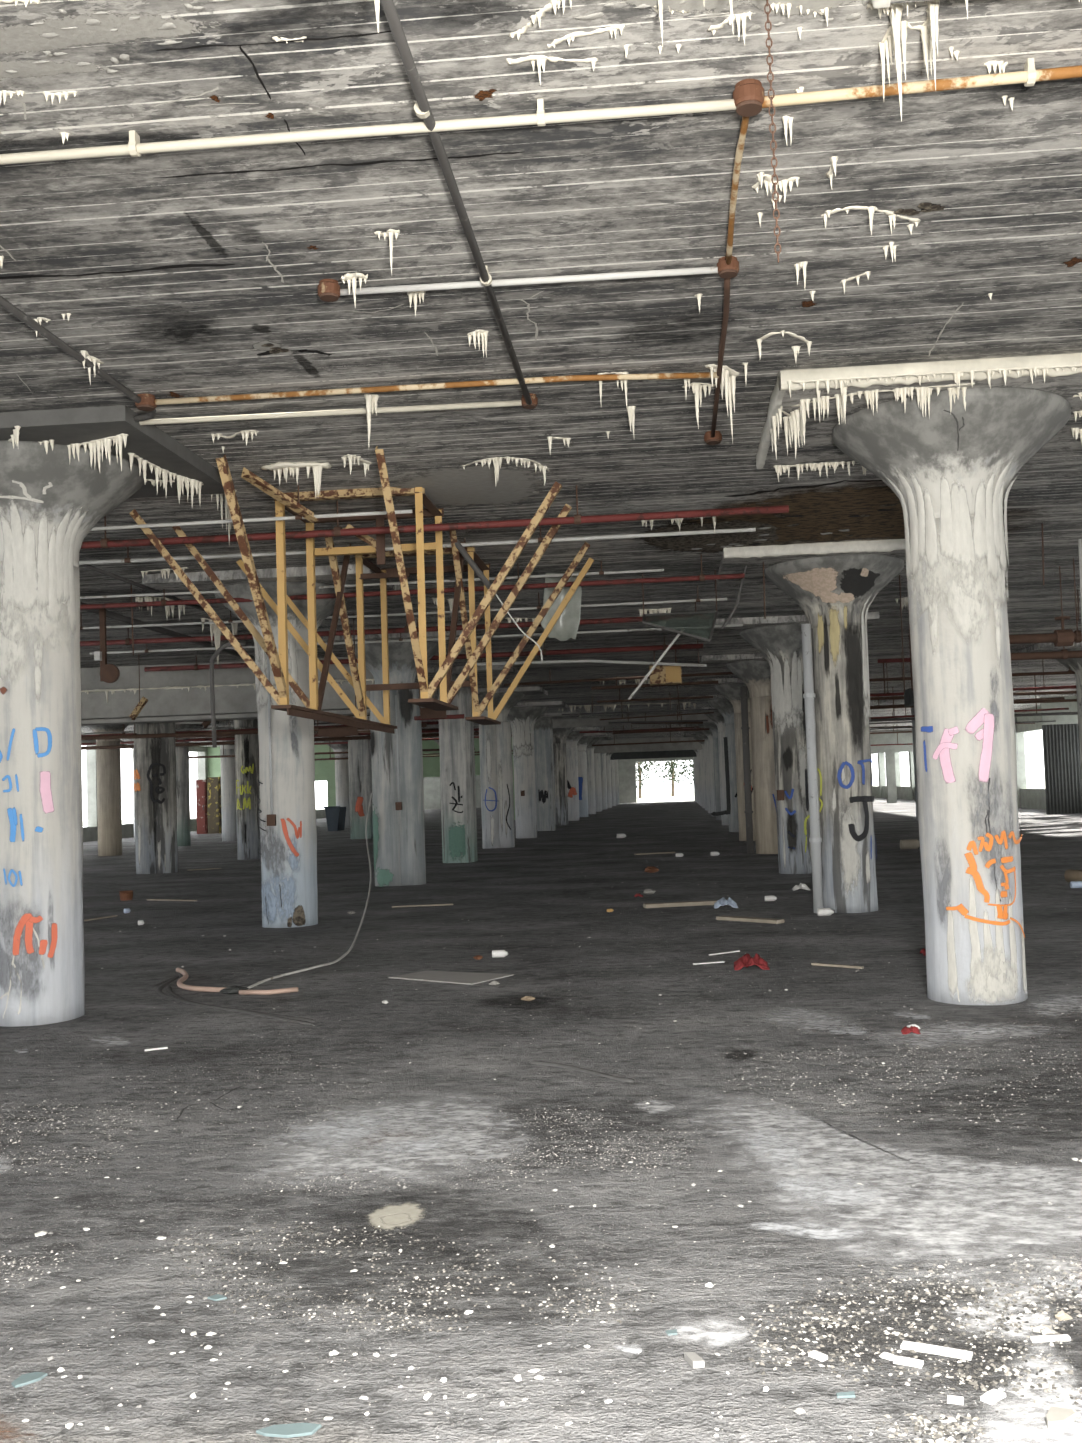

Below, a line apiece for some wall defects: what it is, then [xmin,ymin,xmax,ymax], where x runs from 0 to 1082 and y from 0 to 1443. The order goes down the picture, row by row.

peeling [0,0,233,78]
water stain [508,0,572,40]
water stain [505,25,630,85]
peeling [574,0,871,32]
water stain [866,0,961,121]
water stain [782,116,794,144]
spalling [724,480,881,497]
spalling [635,514,803,554]
water stain [639,330,1082,748]
peeling [783,567,854,603]
water stain [264,1097,523,1179]
water stain [261,1193,575,1315]